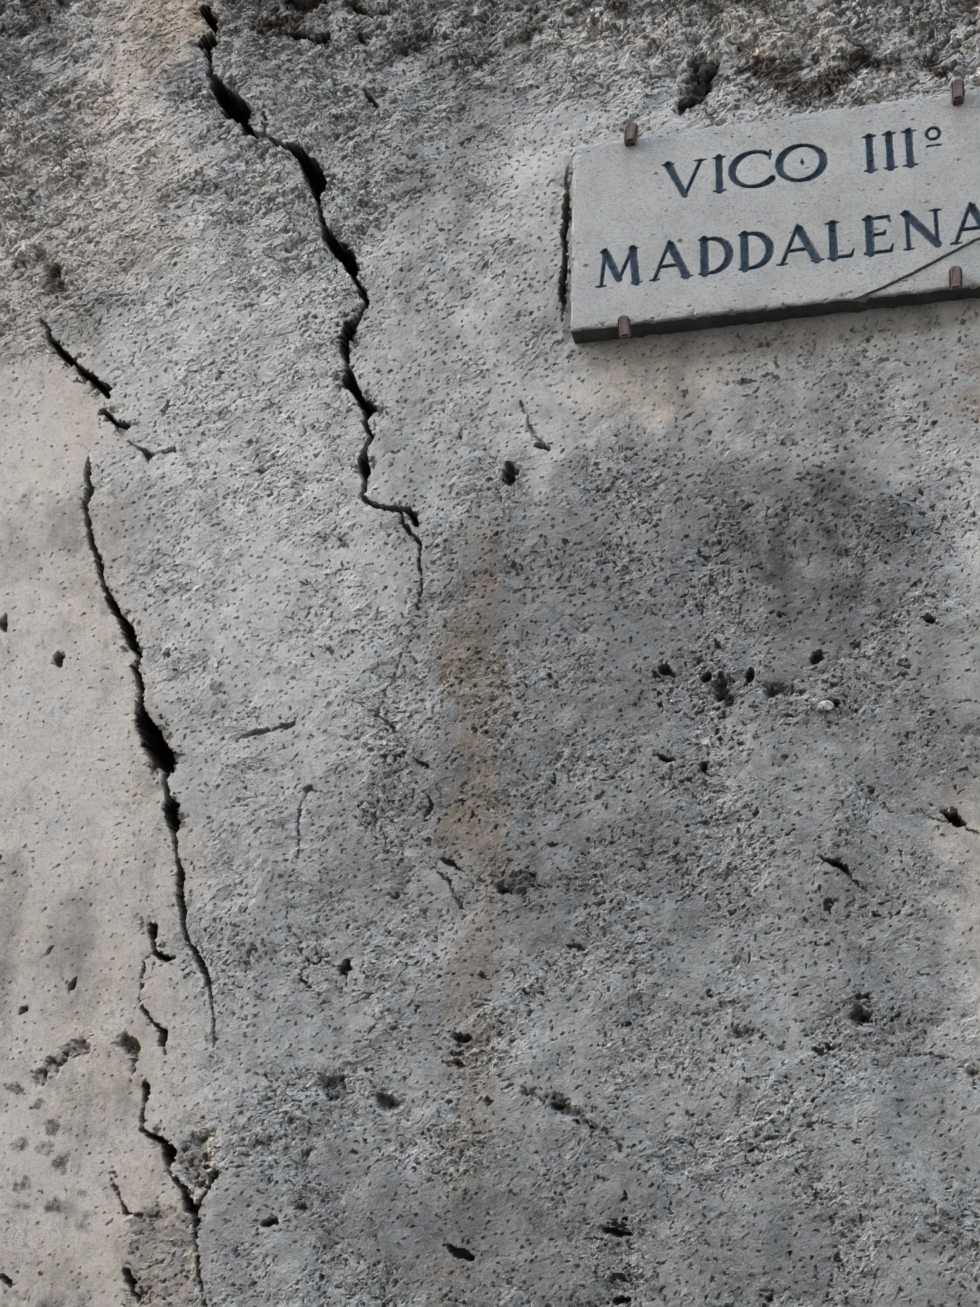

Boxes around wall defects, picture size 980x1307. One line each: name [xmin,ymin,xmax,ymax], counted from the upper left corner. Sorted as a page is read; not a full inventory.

crack [38,318,177,462]
crack [197,4,435,822]
crack [945,697,980,705]
crack [293,784,329,860]
crack [864,796,980,836]
crack [80,456,219,1307]
crack [434,857,465,912]
spalling [950,1049,980,1105]